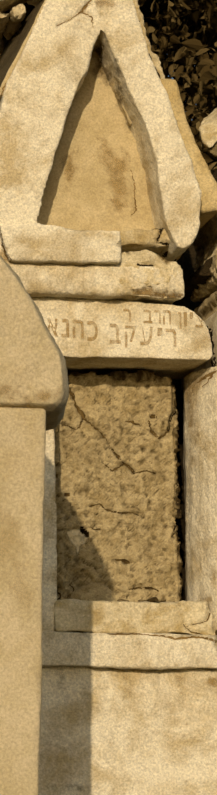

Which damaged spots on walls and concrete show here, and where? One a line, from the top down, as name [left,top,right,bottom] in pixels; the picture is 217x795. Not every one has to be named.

crack [57,0,93,26]
crack [64,380,156,474]
crack [125,420,170,439]
crack [90,503,142,517]
crack [109,613,217,643]